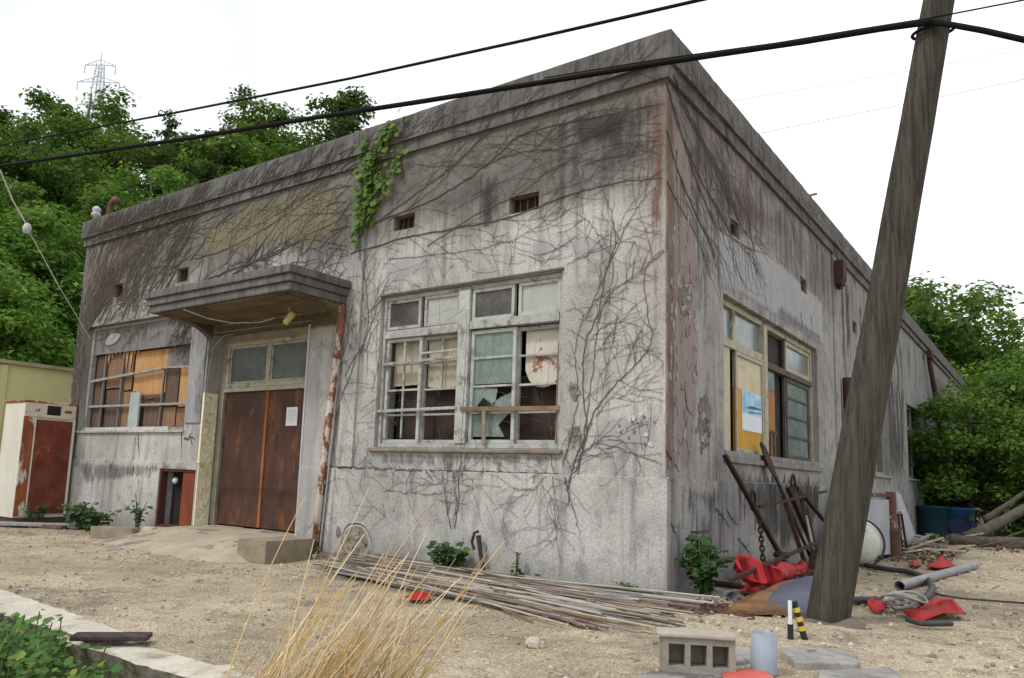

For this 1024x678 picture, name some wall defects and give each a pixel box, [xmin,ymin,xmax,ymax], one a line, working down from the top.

leakage [483,190,492,225]
peeling [669,117,712,468]
leakage [842,285,861,369]
leakage [888,347,916,479]
crack [327,463,581,543]